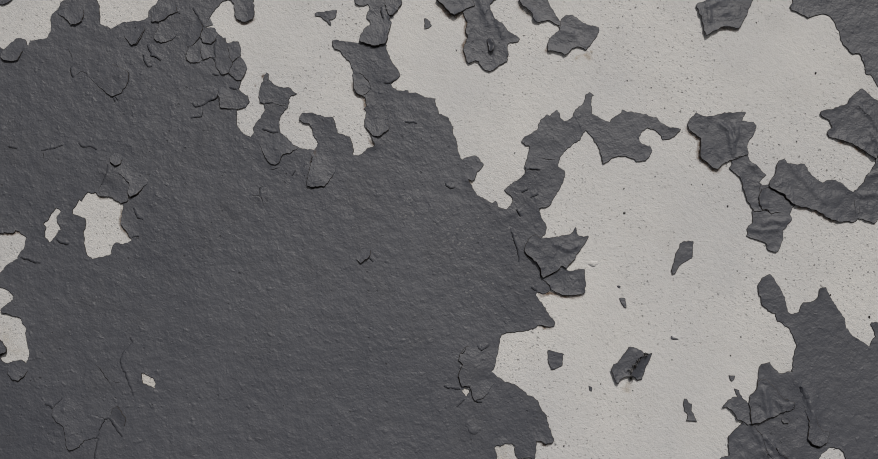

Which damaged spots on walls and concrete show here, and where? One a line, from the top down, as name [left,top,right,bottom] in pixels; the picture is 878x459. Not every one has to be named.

peeling [0,0,84,61]
peeling [0,231,26,272]
peeling [44,208,61,242]
peeling [73,153,148,259]
peeling [186,0,878,459]
peeling [0,288,29,381]
crack [45,337,136,459]
peeling [142,373,156,388]